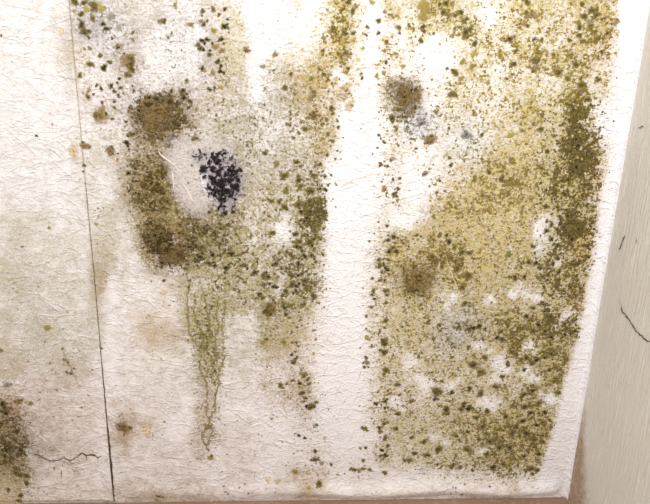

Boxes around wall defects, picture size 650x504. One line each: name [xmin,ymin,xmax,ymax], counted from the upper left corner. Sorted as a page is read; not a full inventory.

water stain [0,220,94,504]
crack [24,451,101,473]
water stain [59,0,375,470]
water stain [282,0,620,500]